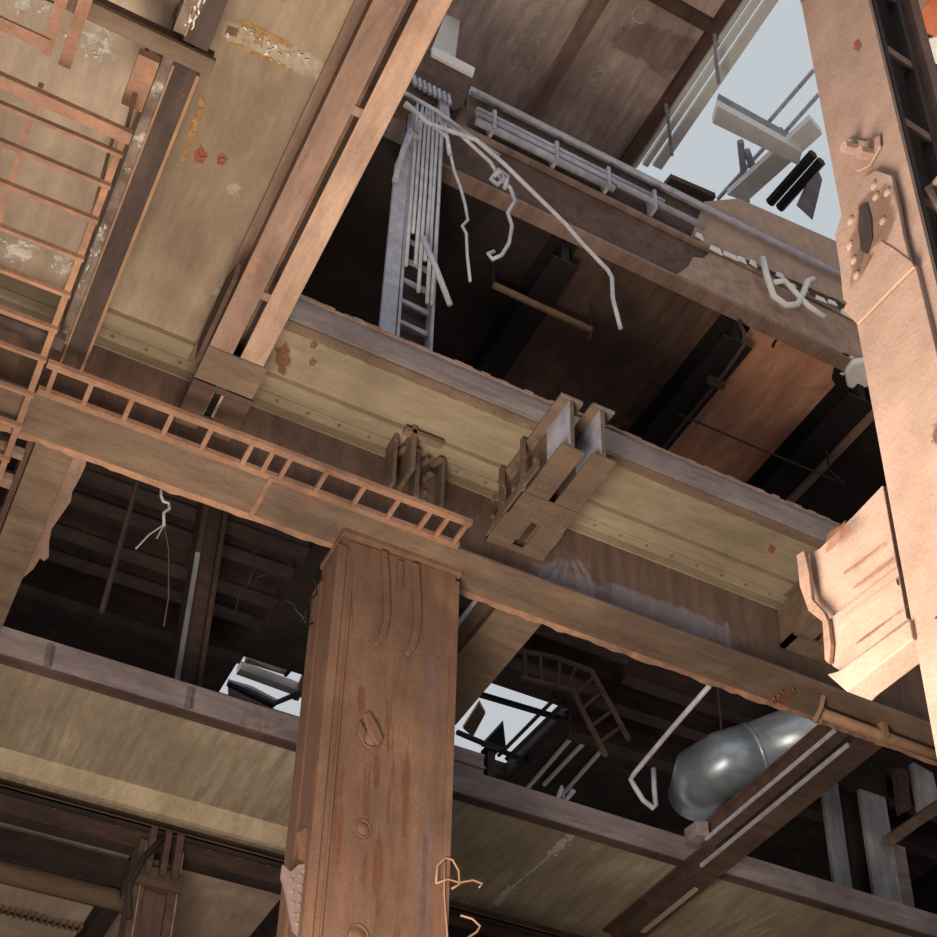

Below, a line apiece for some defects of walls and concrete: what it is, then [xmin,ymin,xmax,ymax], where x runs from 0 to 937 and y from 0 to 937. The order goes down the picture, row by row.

rust [180,98,228,165]
rust [275,343,291,375]
rust [283,294,555,431]
rust [605,425,852,553]